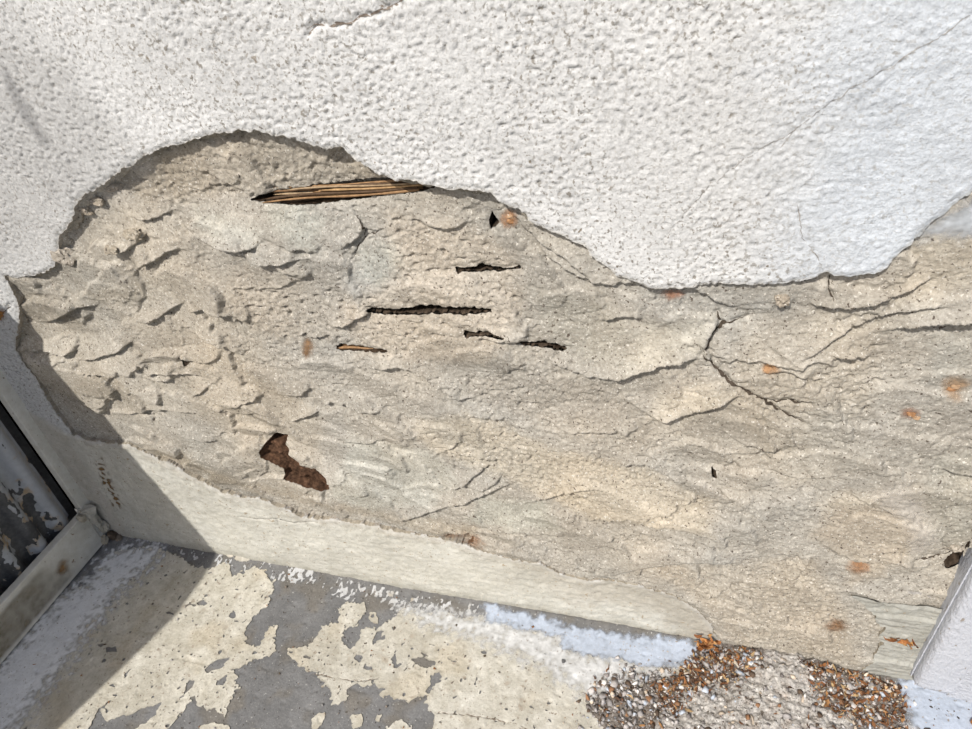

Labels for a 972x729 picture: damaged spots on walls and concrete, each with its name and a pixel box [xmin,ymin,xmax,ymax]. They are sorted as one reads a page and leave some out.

spalling [7,130,972,674]
crack [703,311,809,421]
peeling [0,420,278,729]
peeling [287,601,870,729]
spalling [836,665,907,729]